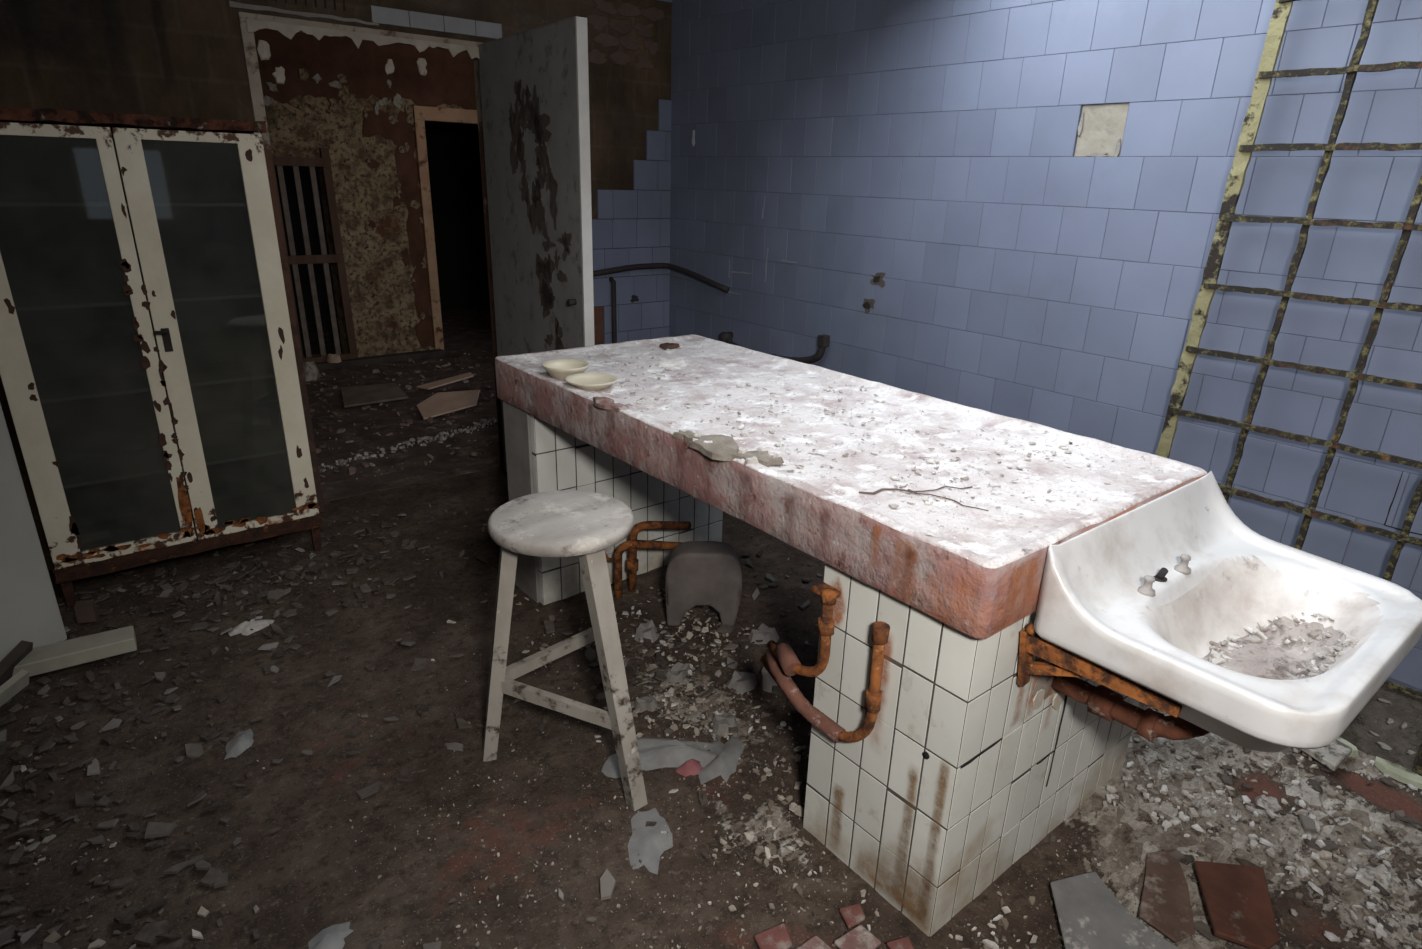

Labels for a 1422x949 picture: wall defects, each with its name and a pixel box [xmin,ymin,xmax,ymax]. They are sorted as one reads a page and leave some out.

peeling [246,19,479,349]
peeling [1074,103,1129,157]